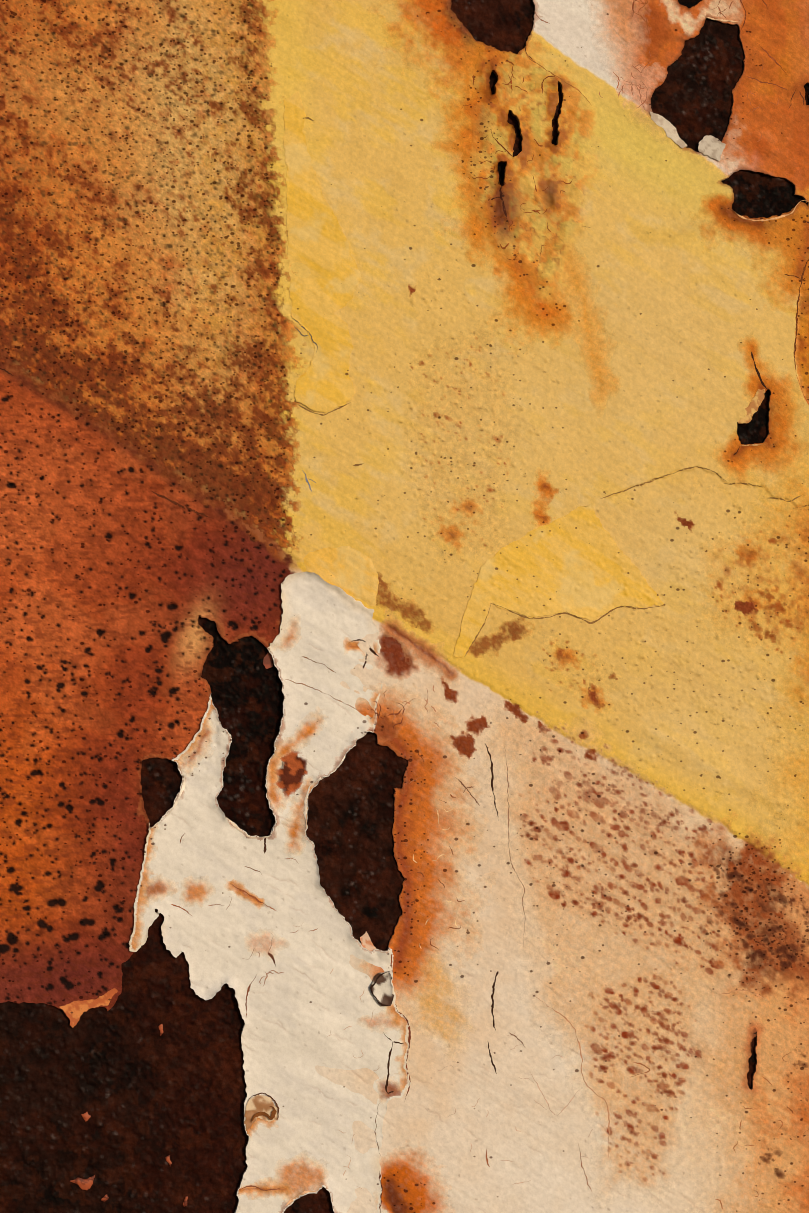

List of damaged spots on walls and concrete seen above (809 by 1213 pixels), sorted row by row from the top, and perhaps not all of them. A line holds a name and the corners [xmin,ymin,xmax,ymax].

peeling [451,0,535,54]
peeling [612,0,808,221]
peeling [737,389,770,446]
corrosion [0,0,311,1016]
crack [601,448,809,509]
corrosion [228,0,809,1213]
crack [465,603,664,656]
peeling [0,546,411,1213]
crack [733,1037,809,1153]